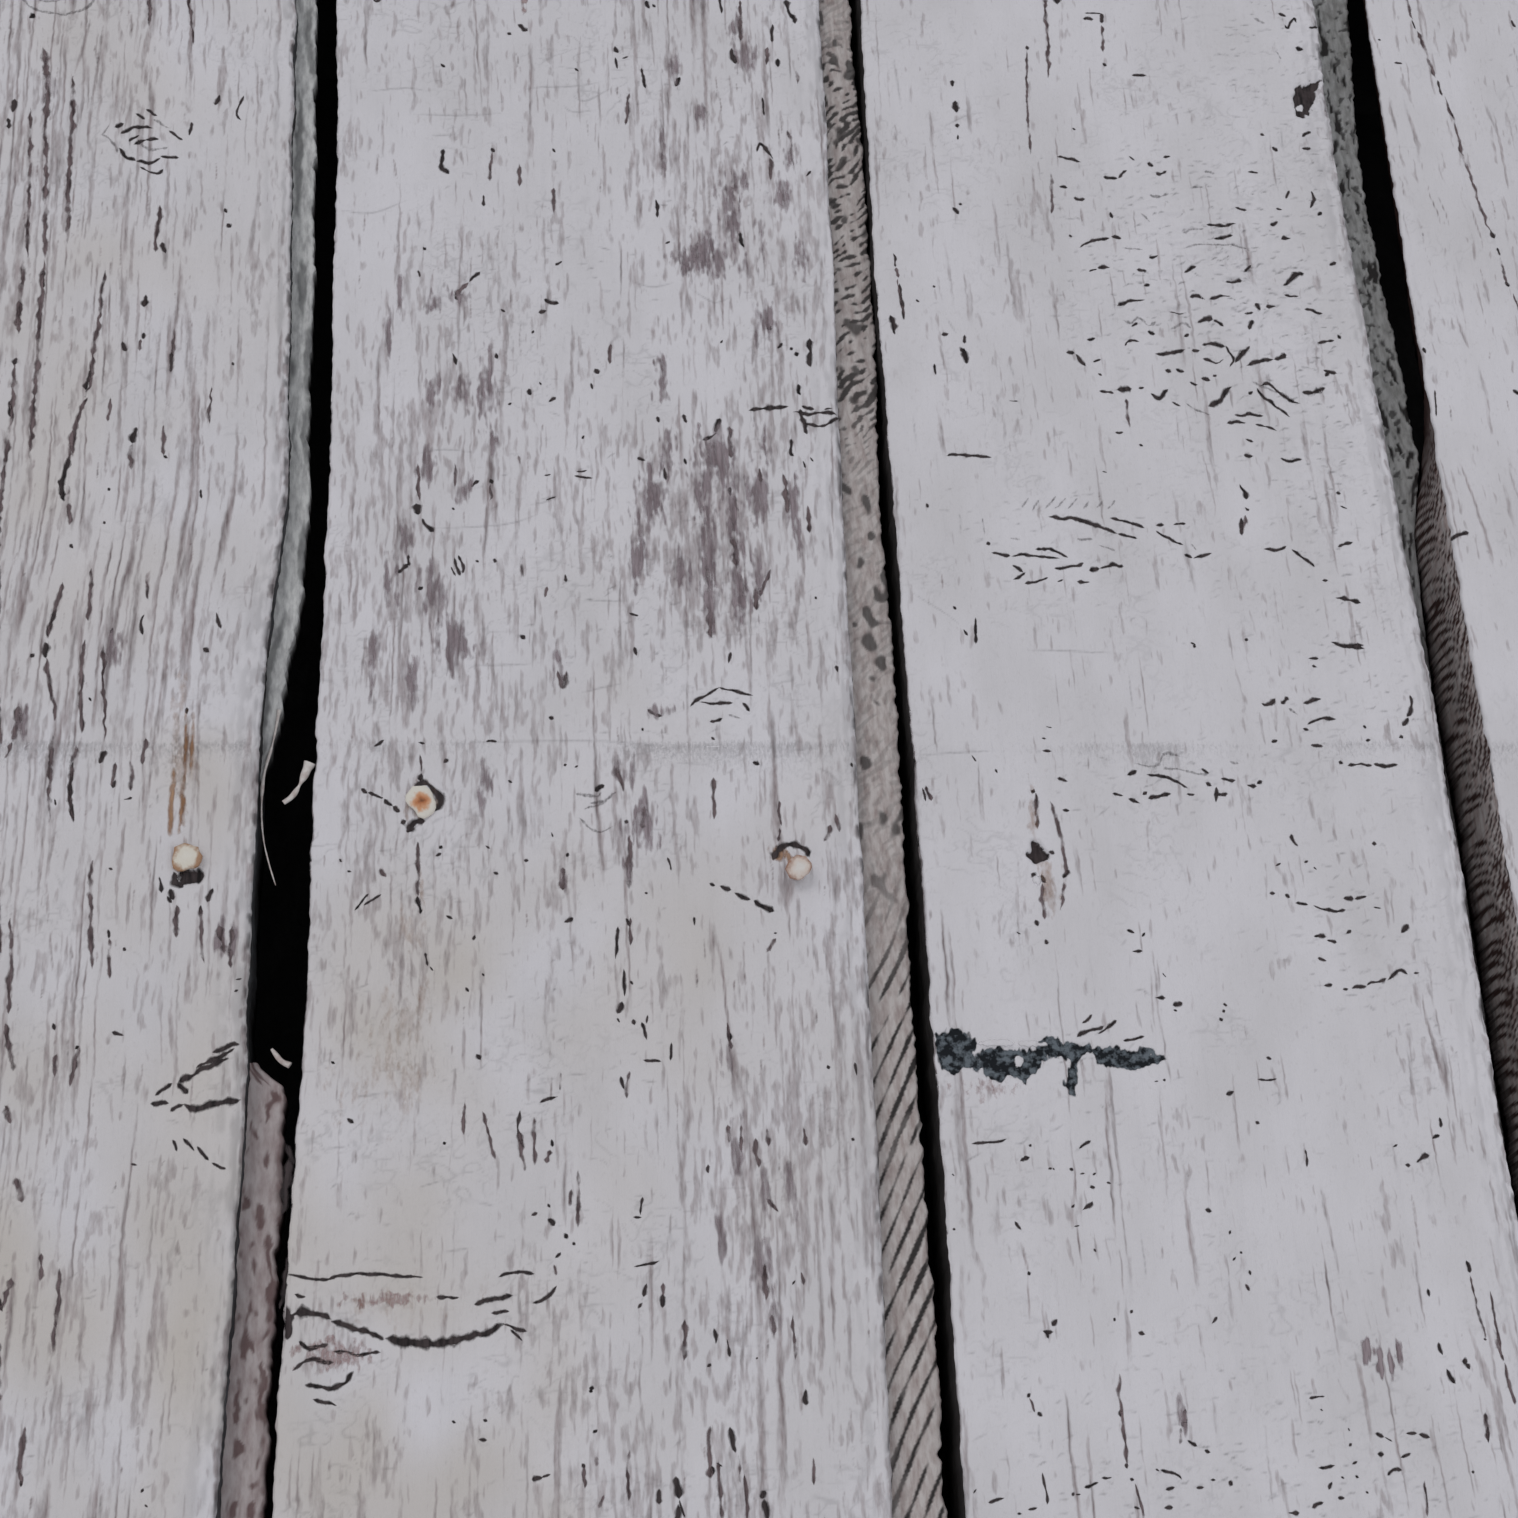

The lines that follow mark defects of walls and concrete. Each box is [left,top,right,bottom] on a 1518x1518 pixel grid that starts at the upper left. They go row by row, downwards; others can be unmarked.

corrosion [168,725,194,833]
corrosion [178,868,204,885]
spalling [935,1015,1166,1096]
crack [279,1088,581,1406]